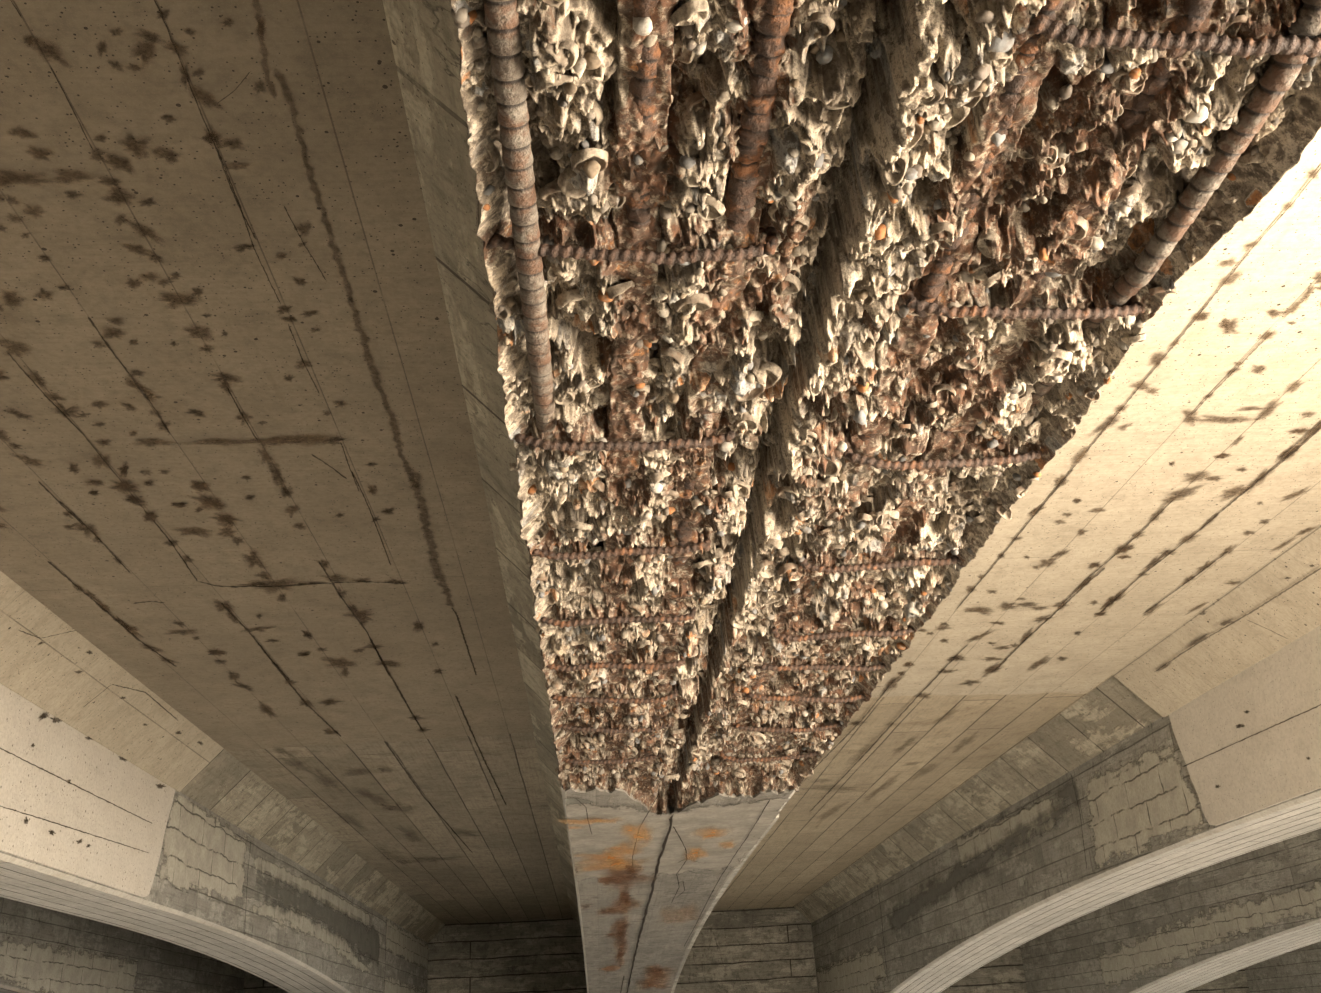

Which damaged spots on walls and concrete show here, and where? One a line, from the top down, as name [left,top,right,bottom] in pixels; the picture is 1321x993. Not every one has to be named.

damp [0,136,227,351]
crack [7,352,422,737]
spalling [450,0,1321,881]
damp [919,575,1066,686]
crack [957,167,1321,608]
crack [996,422,1321,672]
damp [1117,412,1321,559]
damp [1184,383,1303,459]
damp [1262,273,1321,339]
crack [0,748,152,853]
corrosion [583,827,647,971]
crack [620,794,770,993]